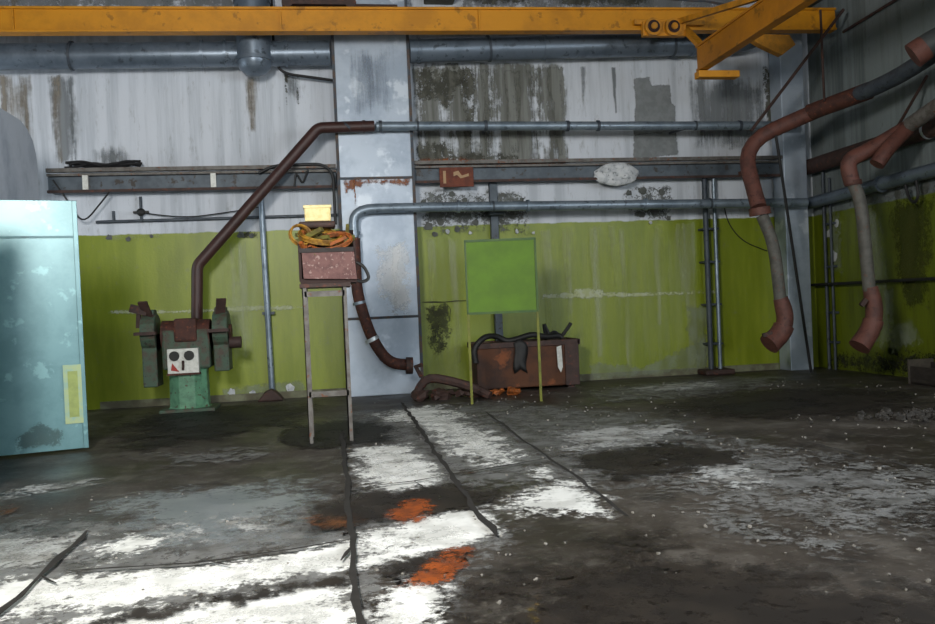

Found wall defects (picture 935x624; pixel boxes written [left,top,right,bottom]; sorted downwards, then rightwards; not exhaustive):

damp [0,76,28,128]
damp [50,76,74,161]
damp [412,63,568,166]
damp [633,77,678,158]
rust [344,179,410,201]
damp [426,303,451,355]